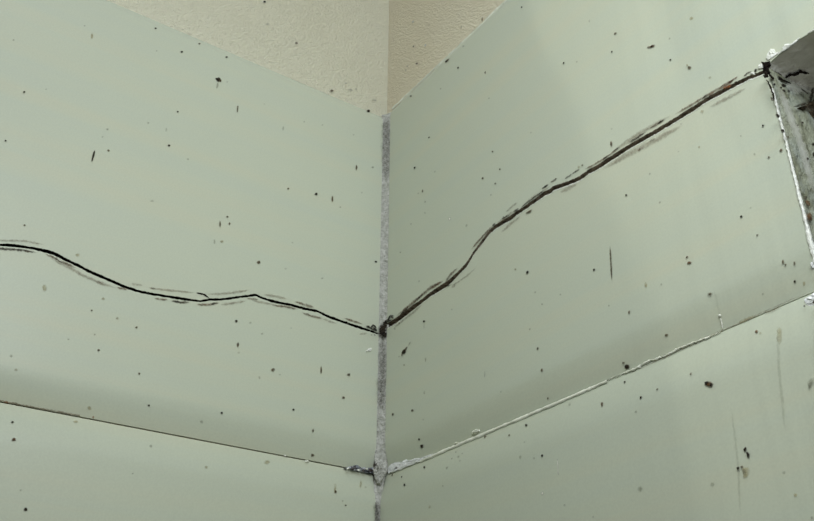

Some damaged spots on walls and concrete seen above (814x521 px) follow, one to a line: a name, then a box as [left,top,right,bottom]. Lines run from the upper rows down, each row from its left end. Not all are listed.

crack [0,61,809,335]